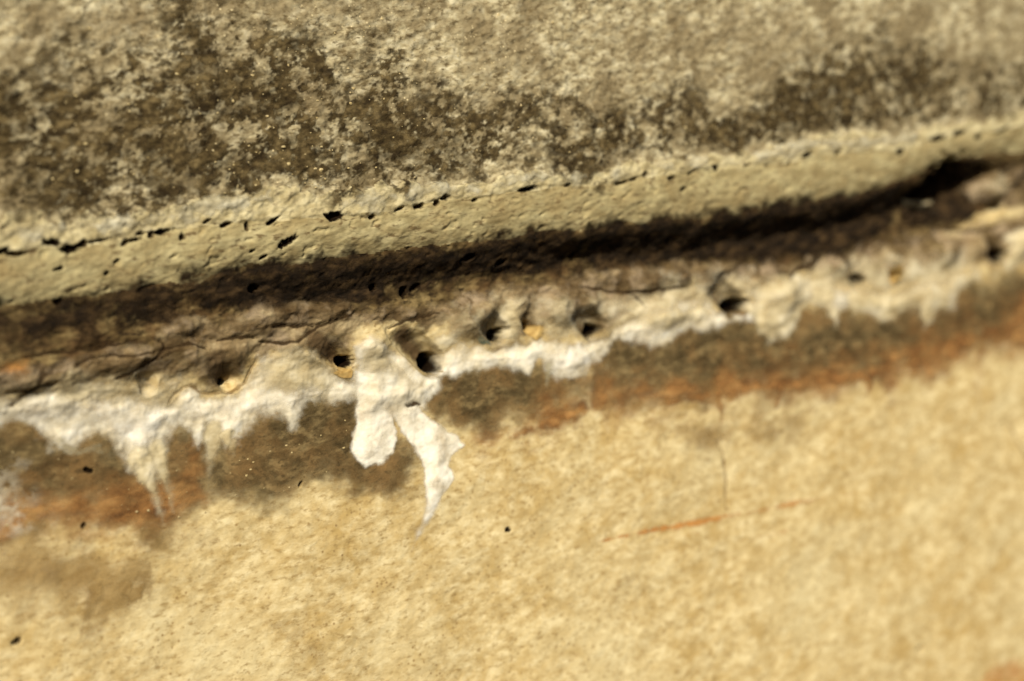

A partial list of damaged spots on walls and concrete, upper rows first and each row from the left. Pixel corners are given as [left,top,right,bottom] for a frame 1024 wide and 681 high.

leakage [0,0,1024,240]
crack [929,127,1007,142]
crack [743,151,851,166]
crack [615,166,718,186]
crack [518,185,537,193]
crack [323,195,475,222]
crack [0,217,278,257]
crack [790,254,823,278]
crack [581,286,685,304]
leakage [0,165,1024,522]
rust [603,515,727,541]